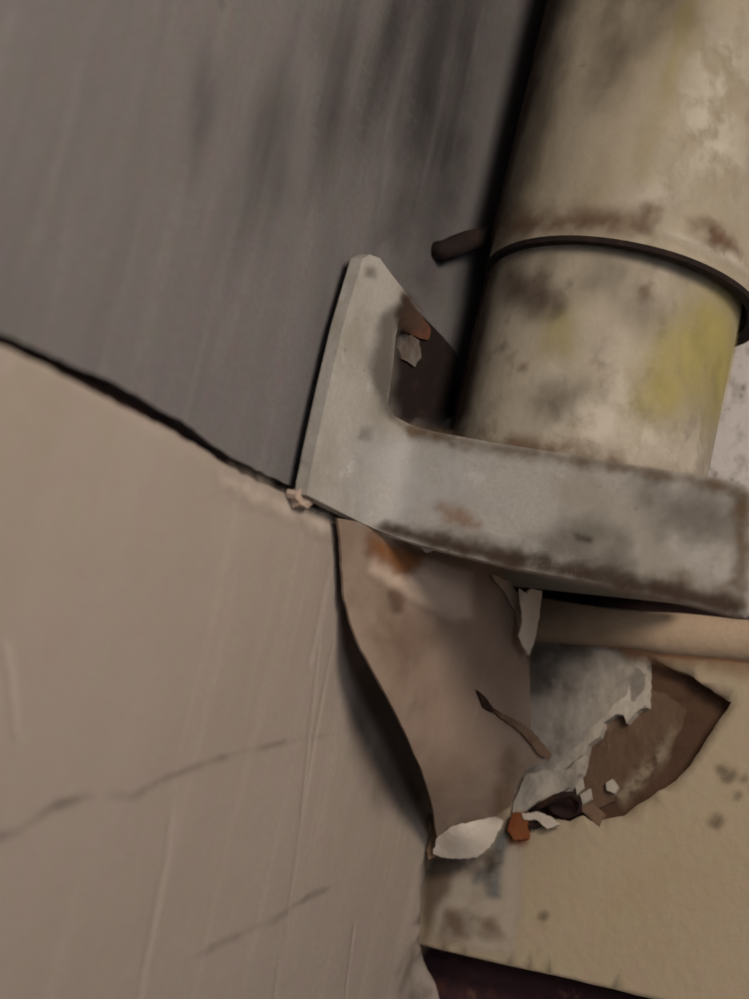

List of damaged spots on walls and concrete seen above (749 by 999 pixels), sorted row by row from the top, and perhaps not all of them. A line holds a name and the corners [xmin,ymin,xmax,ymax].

corrosion [398,295,431,340]
corrosion [407,213,749,439]
spalling [512,642,731,826]